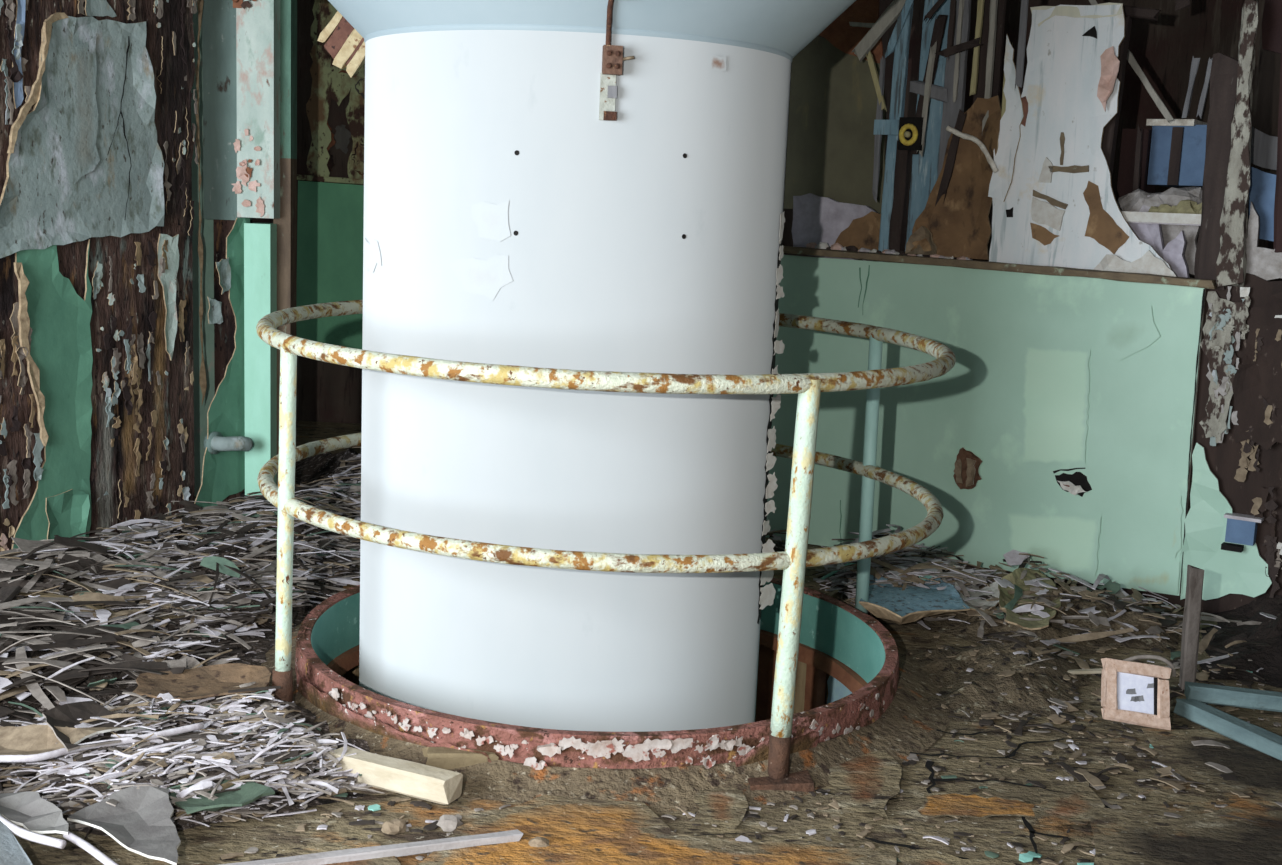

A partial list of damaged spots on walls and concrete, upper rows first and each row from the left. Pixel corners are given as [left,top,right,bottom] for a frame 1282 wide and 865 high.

peeling [306,0,365,182]
peeling [0,0,265,551]
peeling [1030,223,1059,246]
peeling [1083,181,1129,254]
peeling [809,286,1282,655]
rust [297,673,491,762]
rust [735,740,769,767]
rust [790,731,819,754]